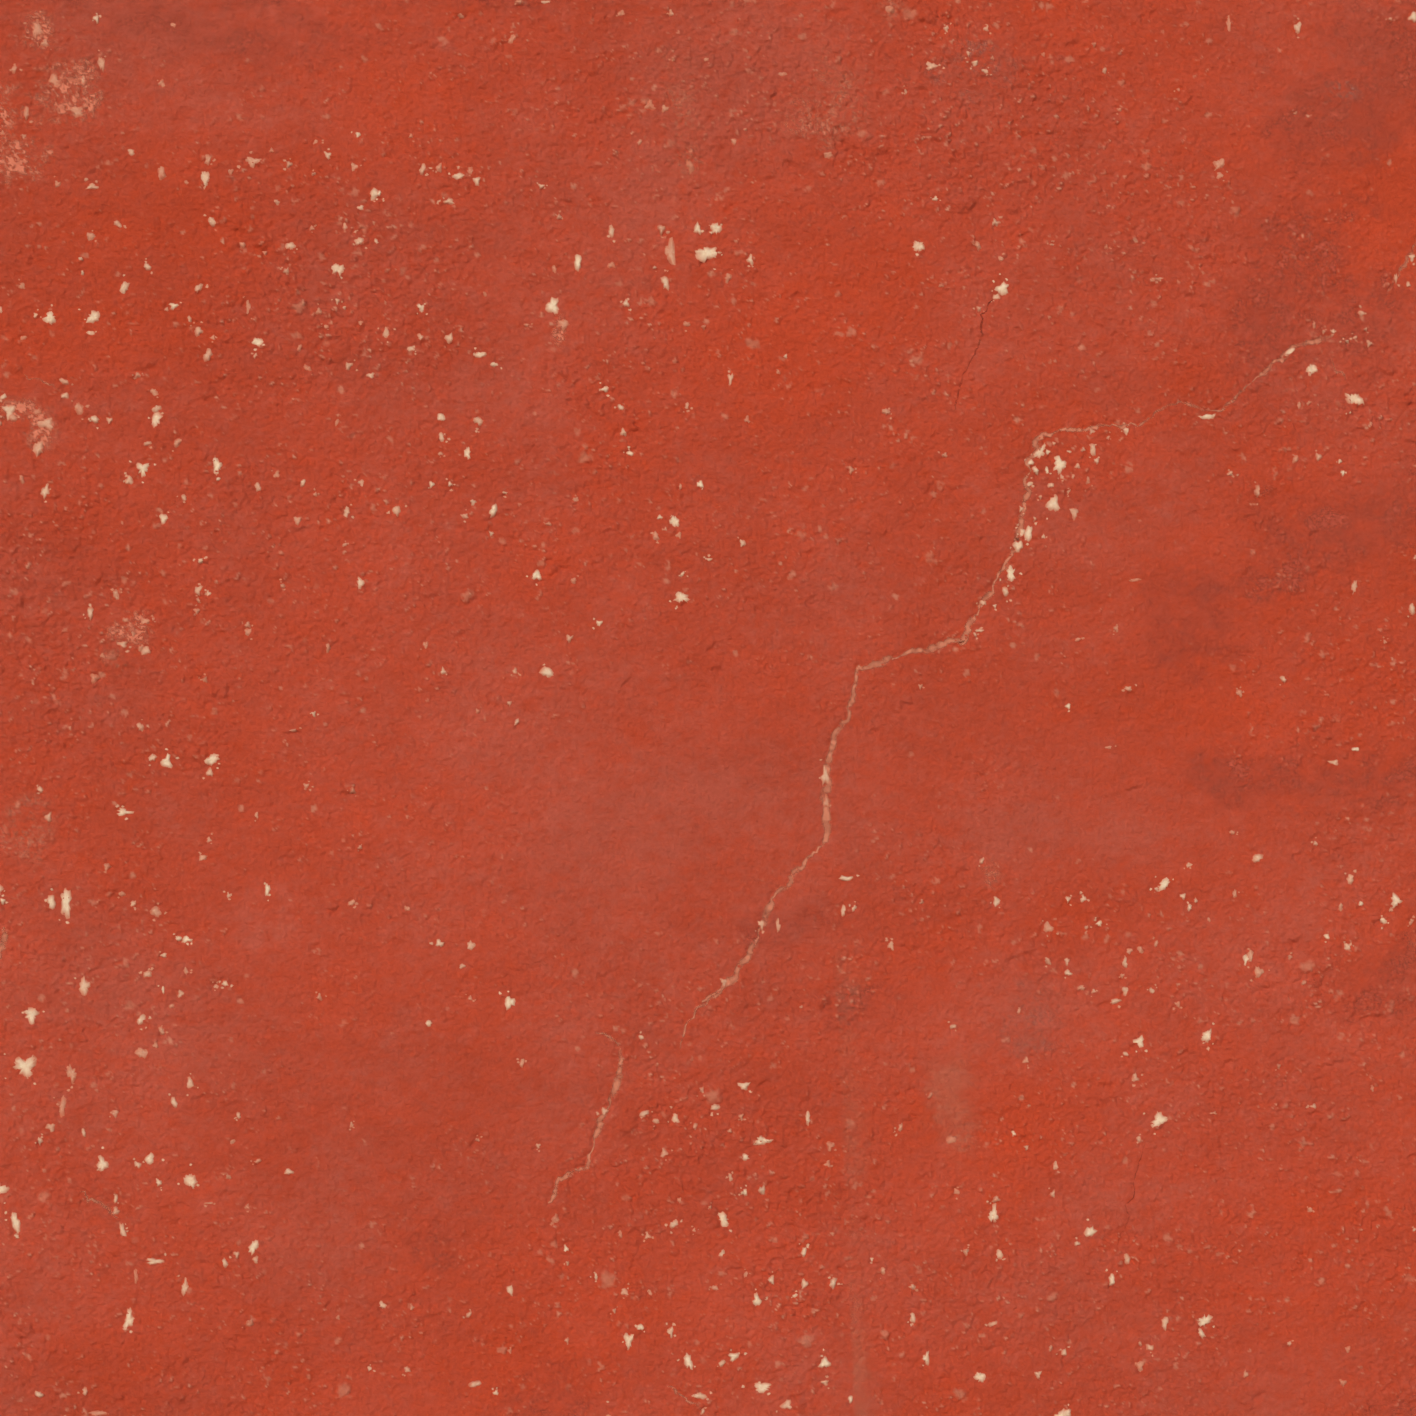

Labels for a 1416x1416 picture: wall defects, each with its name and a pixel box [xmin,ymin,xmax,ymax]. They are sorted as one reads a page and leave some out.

crack [680,334,1343,1045]
crack [548,1033,623,1203]